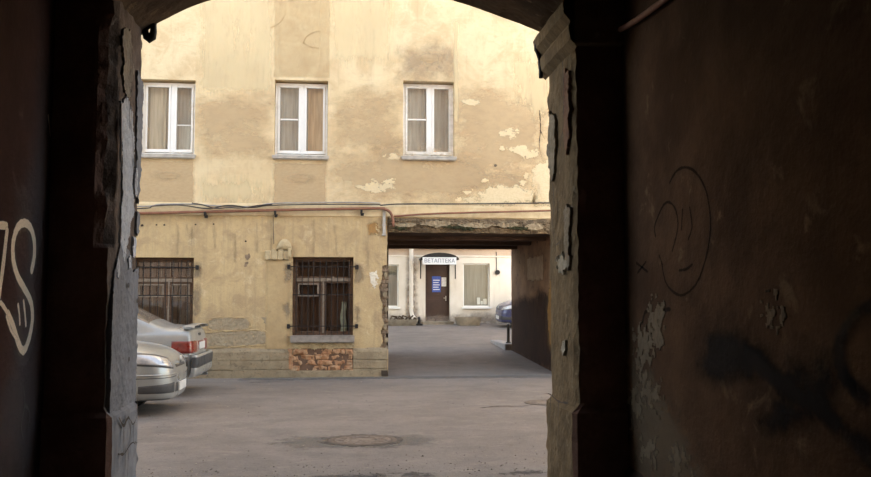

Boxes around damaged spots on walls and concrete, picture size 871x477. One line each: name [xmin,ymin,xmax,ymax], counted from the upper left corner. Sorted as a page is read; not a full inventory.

peeling [354,178,396,194]
peeling [455,68,574,207]
spalling [369,217,544,348]
flaking render [288,343,355,371]
spalling [627,293,666,431]